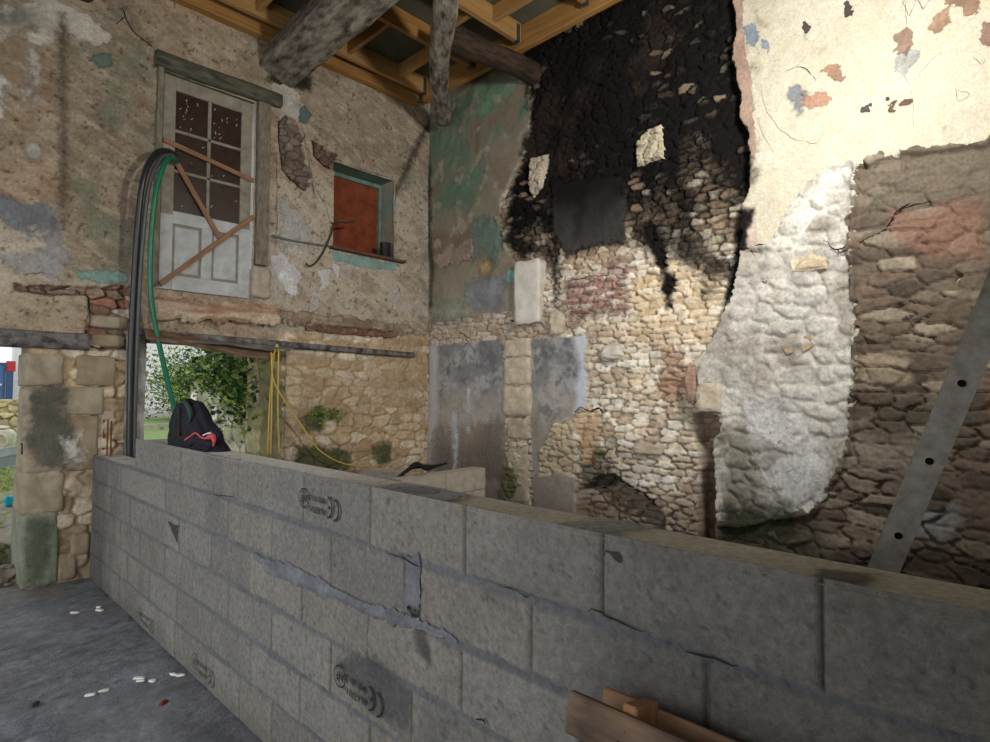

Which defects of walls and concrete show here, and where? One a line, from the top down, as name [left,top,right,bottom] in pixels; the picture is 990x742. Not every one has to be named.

peeling [927,0,990,46]
peeling [893,27,921,78]
spalling [278,115,337,191]
peeling [270,195,319,297]
crack [823,201,931,253]
peeling [318,264,340,290]
spalling [561,256,634,326]
spalling [696,135,990,589]
leakage [60,433,85,462]
leakage [432,387,504,479]
crack [587,608,643,632]
crack [679,644,738,667]